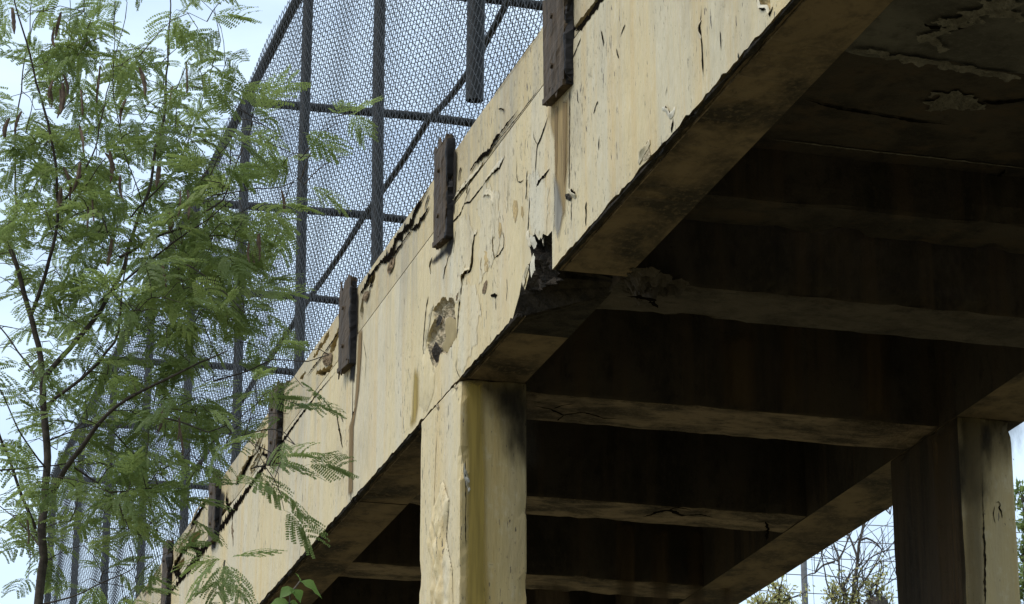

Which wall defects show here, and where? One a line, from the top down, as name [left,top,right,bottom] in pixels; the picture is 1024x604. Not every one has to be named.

spalling [852,0,1024,82]
crack [453,33,598,253]
rust [548,99,568,215]
peeling [923,91,987,112]
crack [359,185,430,300]
peeling [427,155,504,373]
peeling [513,170,567,291]
crack [171,331,339,591]
water stain [467,378,531,604]
crack [645,507,713,518]
crack [982,494,1002,603]